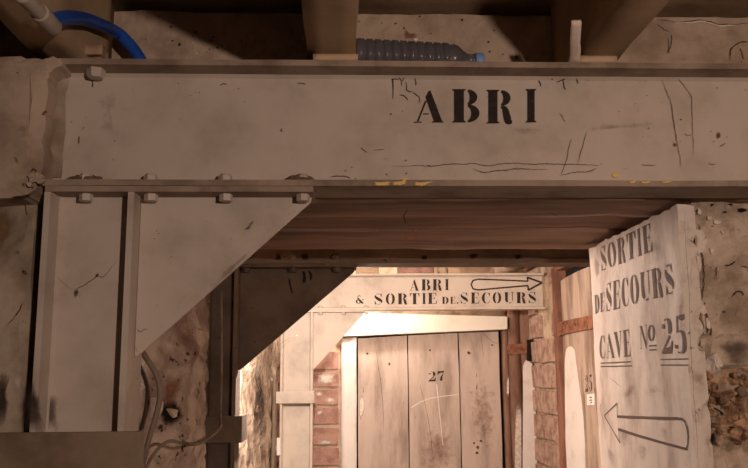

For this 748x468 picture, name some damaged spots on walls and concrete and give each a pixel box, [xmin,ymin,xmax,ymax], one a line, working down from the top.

crack [657,19,748,60]
crack [662,80,715,168]
crack [412,136,603,176]
water stain [27,392,54,424]
spalling [706,354,748,446]